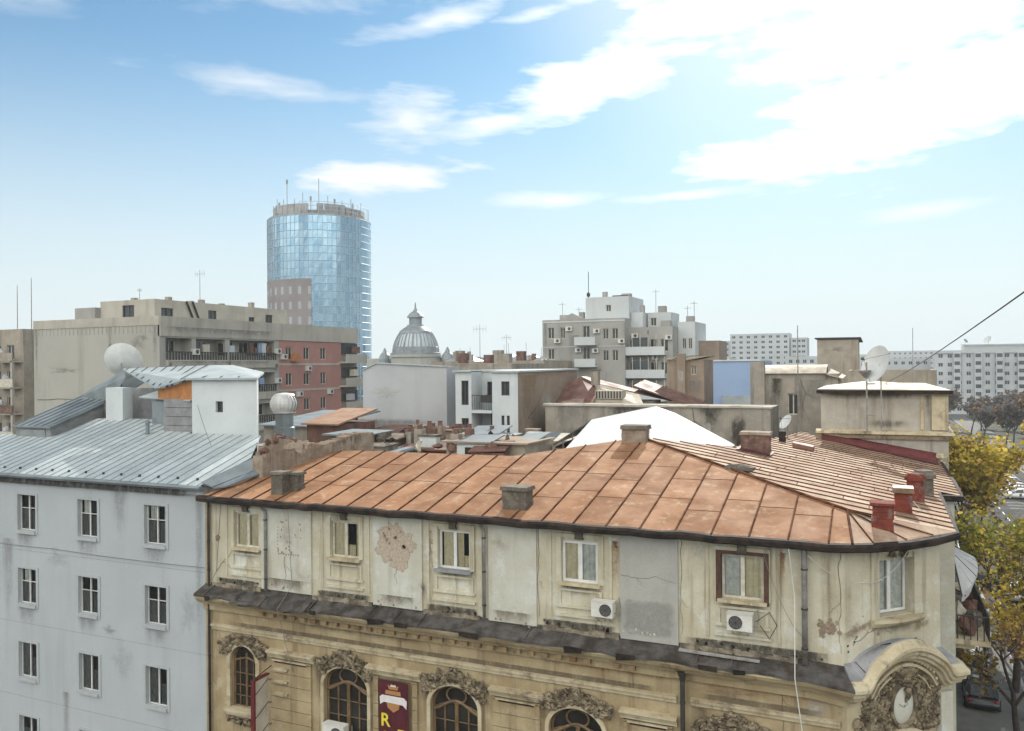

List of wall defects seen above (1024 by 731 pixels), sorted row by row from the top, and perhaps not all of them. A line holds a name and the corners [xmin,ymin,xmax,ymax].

peeling [374,521,416,582]
crack [622,542,688,634]
peeling [817,616,880,653]